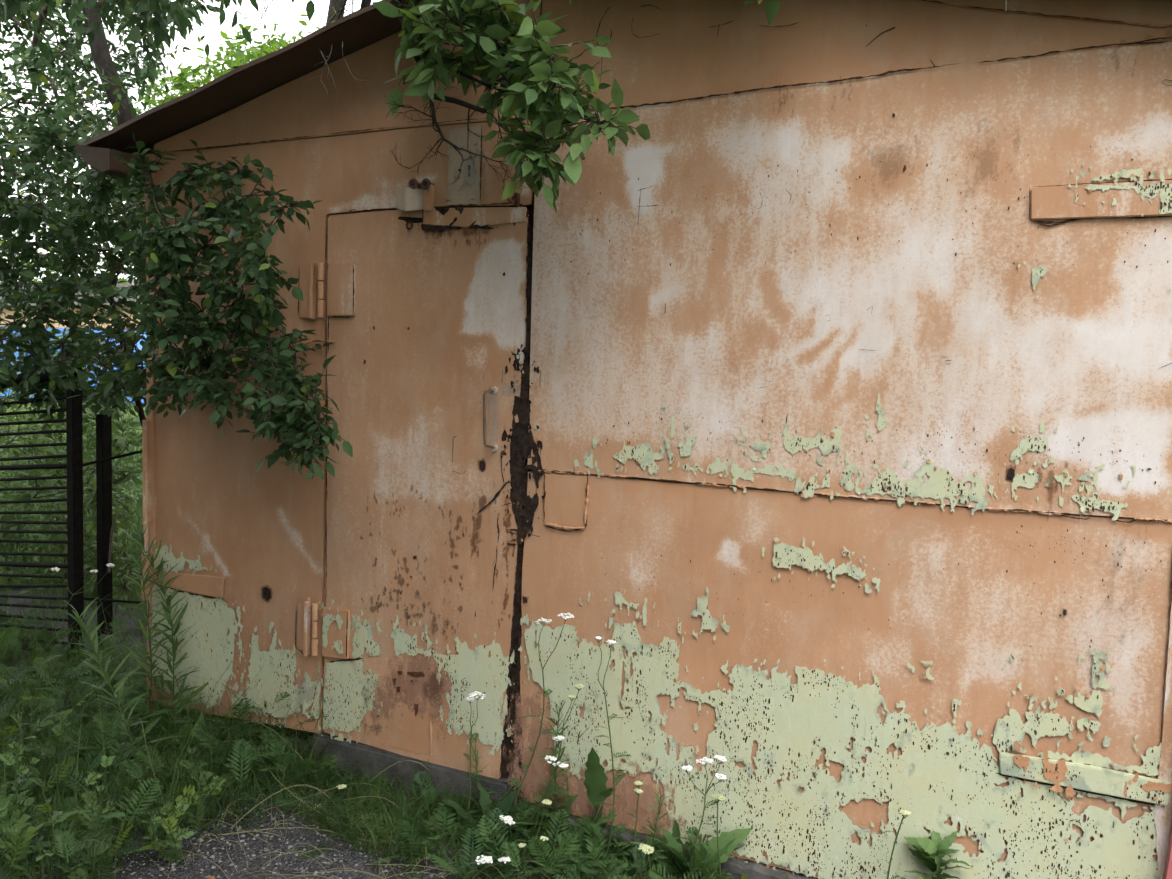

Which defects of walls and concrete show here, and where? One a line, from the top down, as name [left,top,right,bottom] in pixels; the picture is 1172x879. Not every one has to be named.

peeling [145,532,1172,879]